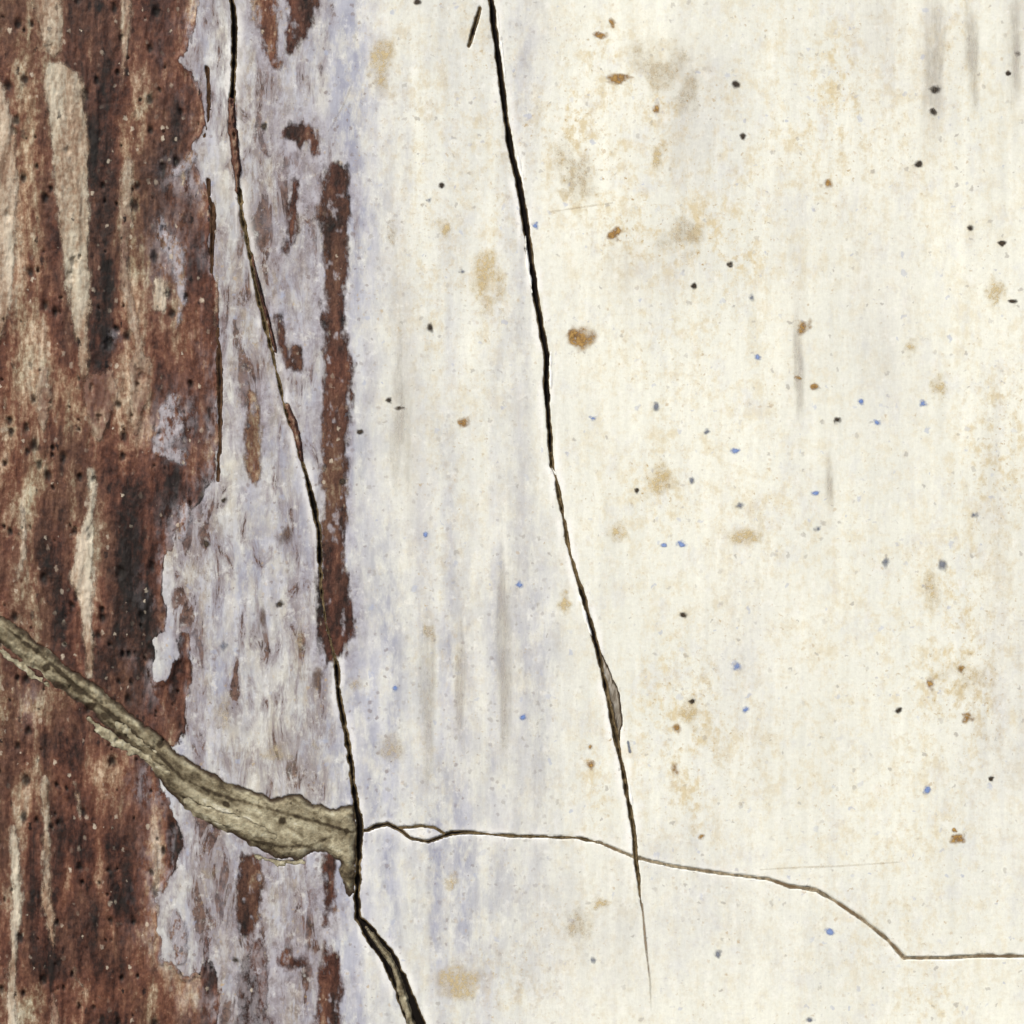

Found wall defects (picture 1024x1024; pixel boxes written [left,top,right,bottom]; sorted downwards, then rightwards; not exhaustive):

peeling [250,0,319,70]
peeling [282,120,320,155]
peeling [281,178,299,254]
peeling [274,314,303,372]
peeling [316,161,356,664]
peeling [0,0,277,1024]
crack [228,0,1024,1024]
peeling [321,853,337,926]
peeling [236,852,306,1024]
peeling [315,942,344,1024]